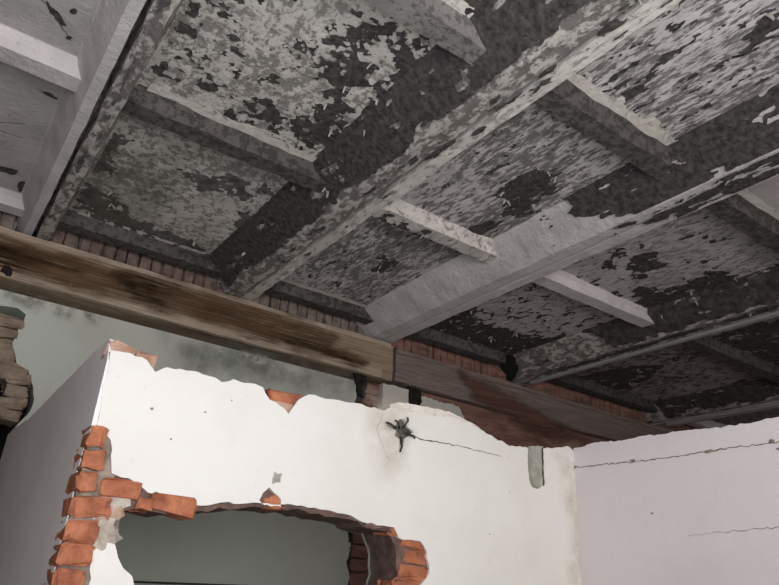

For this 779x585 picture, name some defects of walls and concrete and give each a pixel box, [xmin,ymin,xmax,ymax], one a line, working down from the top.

peeling [468,0,779,237]
peeling [71,0,597,308]
peeling [679,232,733,244]
peeling [429,244,779,419]
spalling [386,417,416,452]
crack [411,436,501,457]
crack [574,439,779,469]
flaking render [261,495,283,511]
flaking render [346,532,355,583]
flaking render [363,523,429,585]